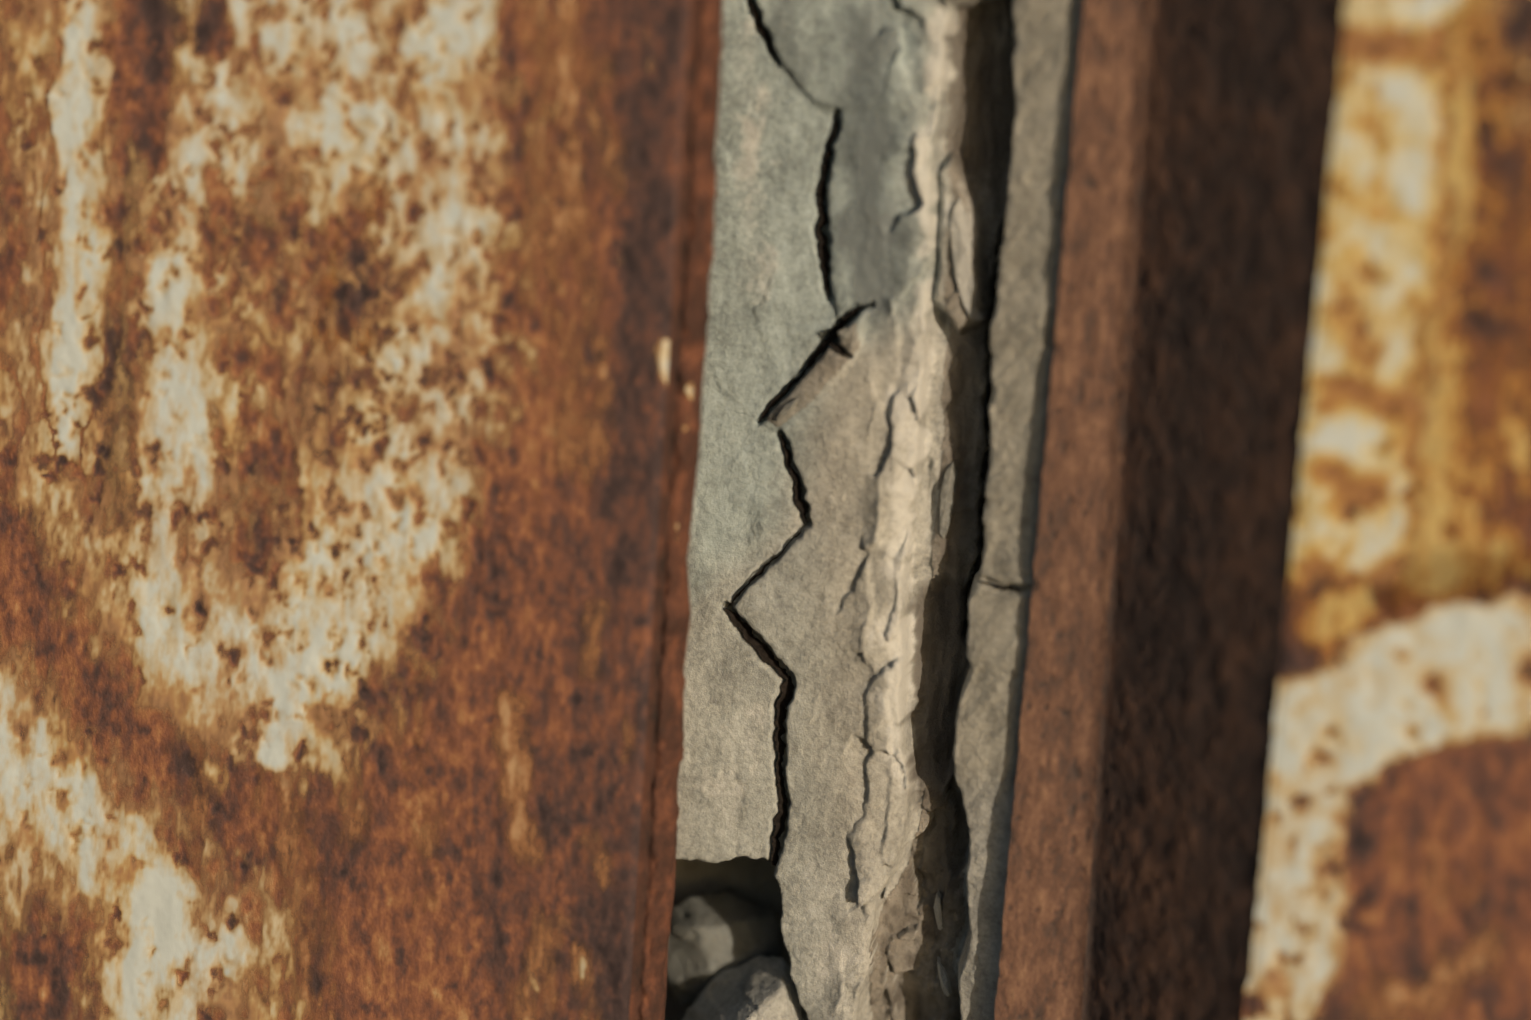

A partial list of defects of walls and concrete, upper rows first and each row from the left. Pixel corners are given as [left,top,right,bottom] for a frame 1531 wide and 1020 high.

crack [748,0,781,66]
corrosion [103,274,132,532]
corrosion [516,0,626,482]
crack [724,115,866,866]
crack [964,228,1023,637]
corrosion [1295,0,1531,661]
corrosion [580,600,608,678]
corrosion [255,764,336,1020]
corrosion [493,690,543,864]
corrosion [515,915,599,1020]
corrosion [583,836,609,889]
corrosion [1353,928,1502,1020]